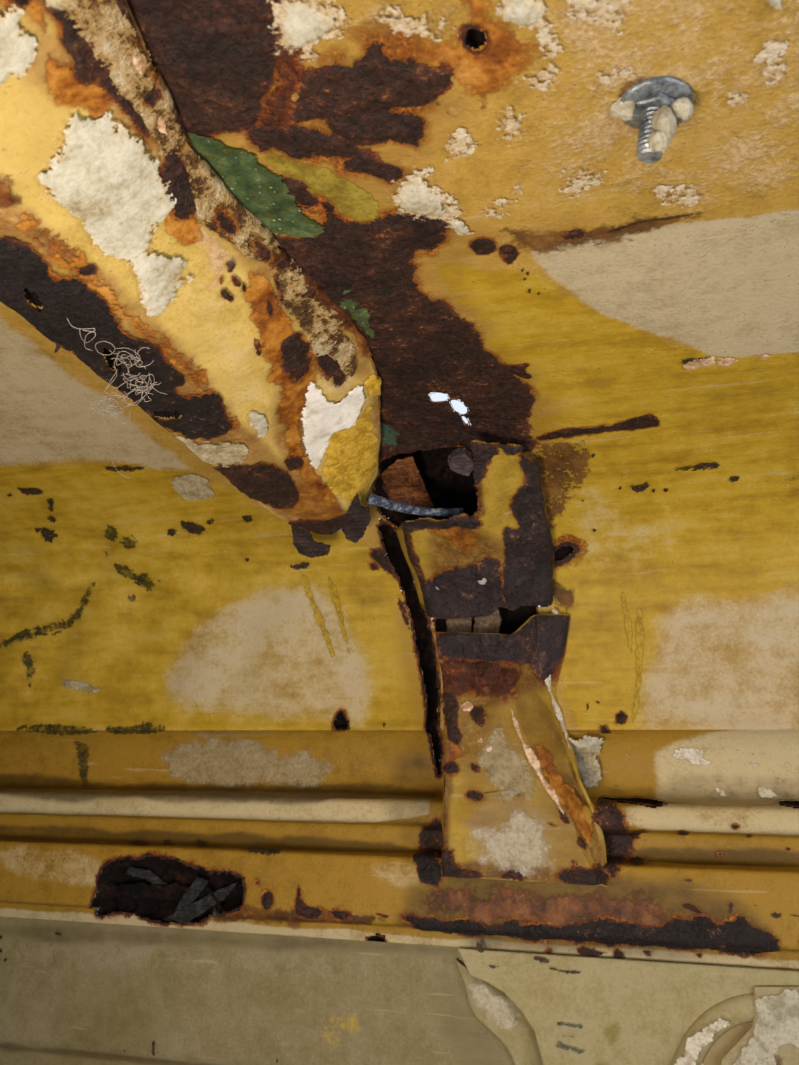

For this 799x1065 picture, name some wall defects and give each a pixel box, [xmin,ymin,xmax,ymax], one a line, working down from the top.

rust [0,176,240,441]
peeling [46,0,357,378]
rust [0,0,546,246]
rust [213,176,680,780]
rust [214,744,781,959]
peeling [478,708,564,814]
peeling [675,1018,730,1065]
peeling [733,989,799,1065]